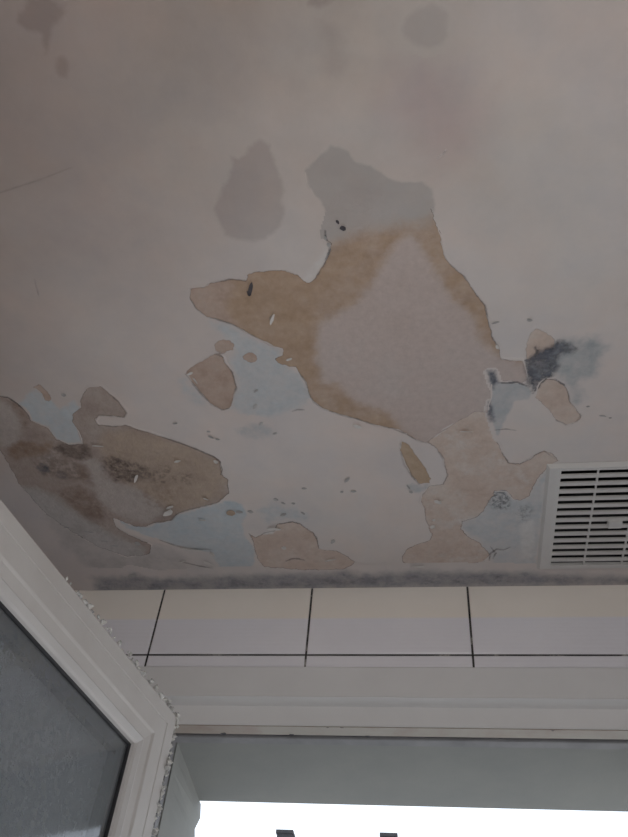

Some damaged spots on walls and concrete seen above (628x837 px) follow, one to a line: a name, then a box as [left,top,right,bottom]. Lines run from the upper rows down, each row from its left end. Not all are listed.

leakage [9,0,77,84]
leakage [117,0,531,248]
peeling [185,187,590,568]
leakage [525,323,623,414]
peeling [0,382,358,571]
leakage [79,562,628,590]